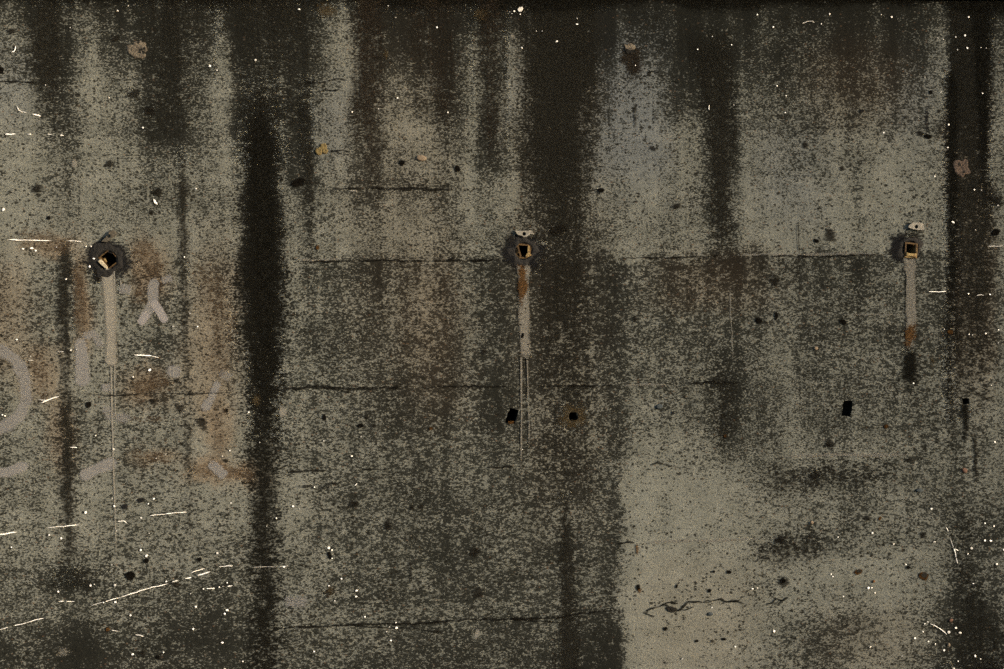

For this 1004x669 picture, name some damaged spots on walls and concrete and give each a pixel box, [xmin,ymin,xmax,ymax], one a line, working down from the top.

water stain [225,0,338,669]
water stain [476,0,603,488]
water stain [686,27,740,250]
water stain [710,295,738,445]
water stain [944,6,997,480]
crack [281,610,619,633]
water stain [552,503,581,669]
crack [644,596,788,617]